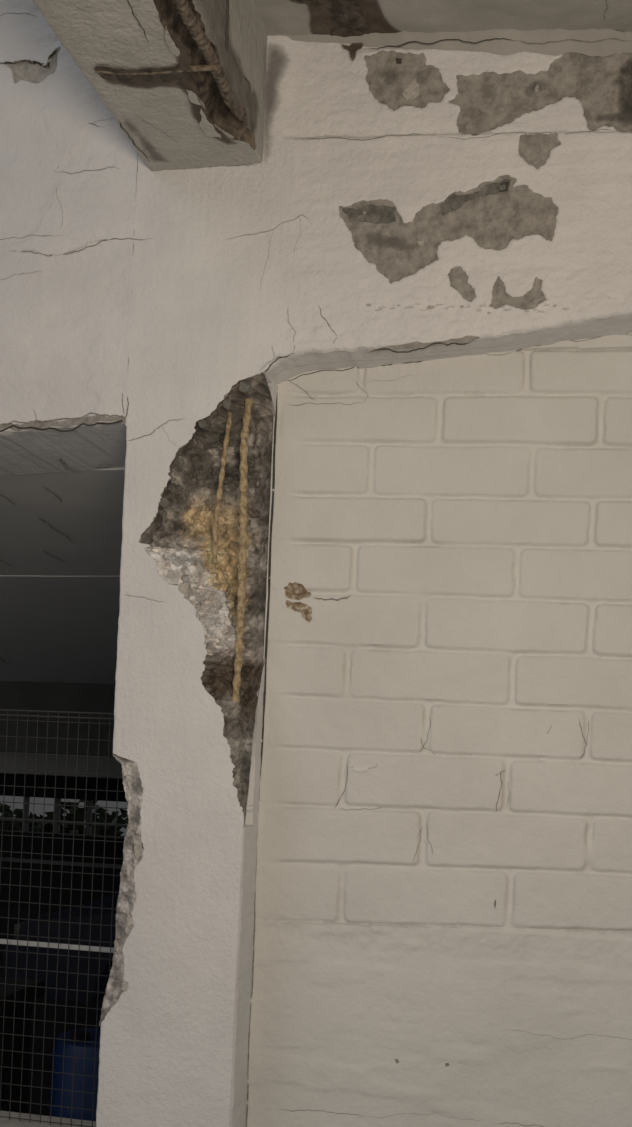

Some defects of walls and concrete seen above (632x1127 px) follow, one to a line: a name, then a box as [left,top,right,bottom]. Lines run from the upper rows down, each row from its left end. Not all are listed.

peeling [0,45,61,88]
spalling [94,0,258,150]
peeling [364,50,632,135]
crack [118,116,177,161]
peeling [518,133,561,169]
crack [0,235,152,280]
peeling [339,175,558,284]
spalling [138,373,276,825]
spalling [99,755,144,1025]